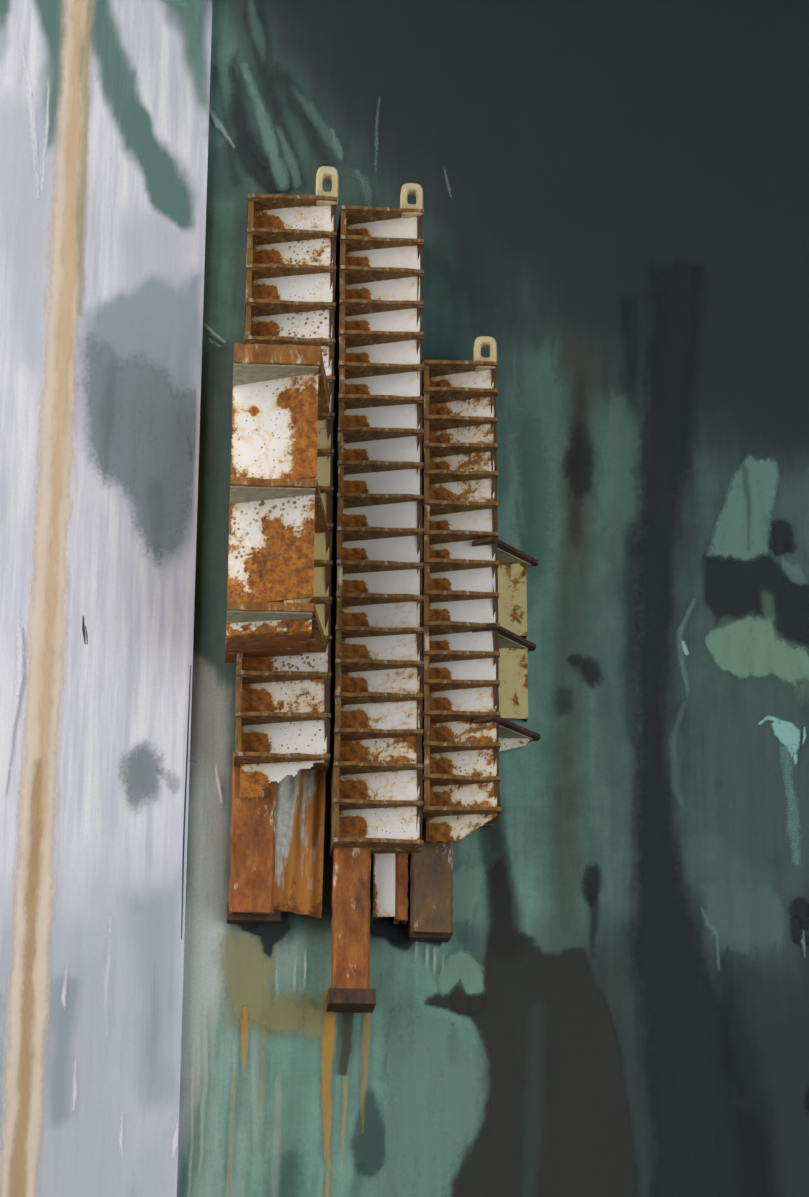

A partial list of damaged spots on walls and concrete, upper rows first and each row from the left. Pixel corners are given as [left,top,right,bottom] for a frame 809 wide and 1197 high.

leakage [85,337,196,549]
leakage [125,749,160,805]
leakage [352,264,809,1197]
leakage [238,914,290,957]
rust [223,933,347,1197]
rust [362,1012,370,1116]